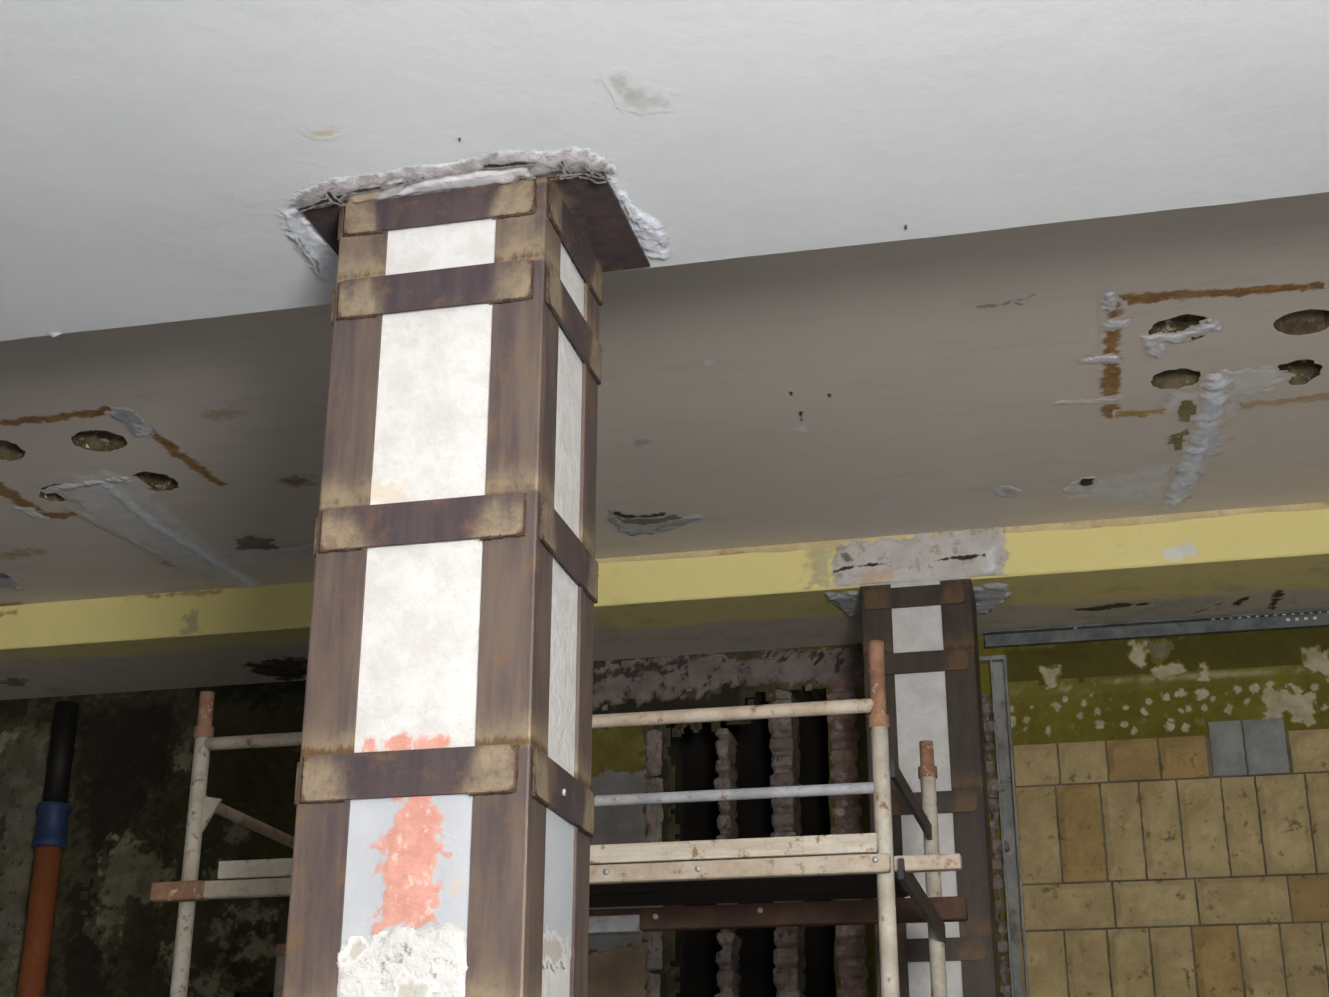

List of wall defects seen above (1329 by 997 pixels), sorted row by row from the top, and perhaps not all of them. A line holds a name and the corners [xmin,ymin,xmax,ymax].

spalling [285,146,619,212]
corrosion [1092,278,1329,421]
corrosion [0,404,114,429]
corrosion [146,428,233,490]
corrosion [0,479,85,523]
spalling [604,508,708,537]
peeling [978,543,1002,575]
leakage [999,626,1329,698]
flaking render [358,723,456,753]
leakage [0,676,306,900]
flaking render [338,795,459,966]